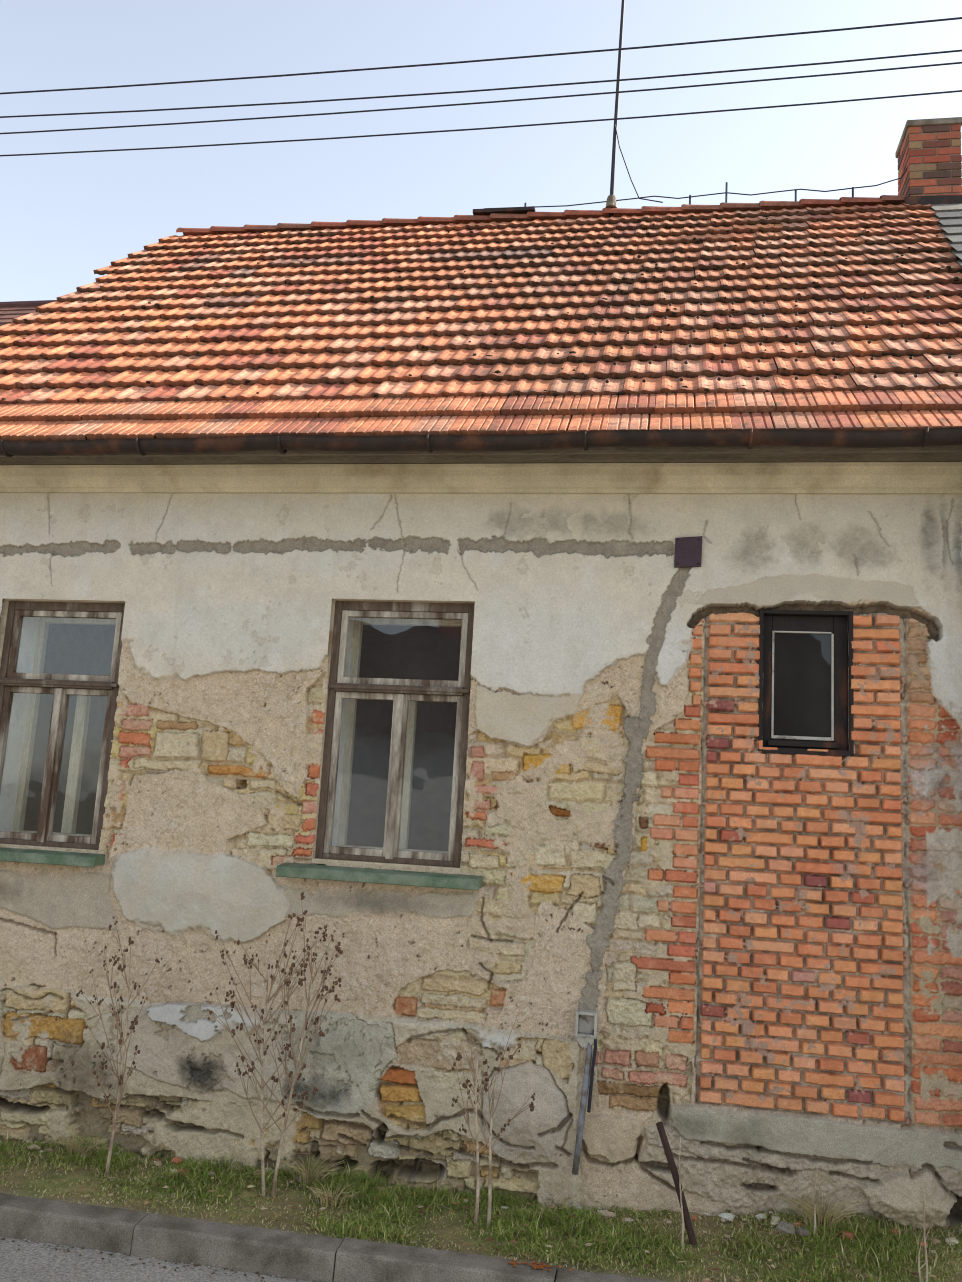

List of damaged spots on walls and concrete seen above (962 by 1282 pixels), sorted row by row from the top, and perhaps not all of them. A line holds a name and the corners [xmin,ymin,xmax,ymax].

crack [46,493,55,588]
crack [155,493,173,547]
crack [369,494,407,594]
crack [457,549,479,591]
crack [274,790,303,808]
flaking render [1,573,962,1180]
peeling [465,1162,539,1203]
spalling [639,1144,900,1225]